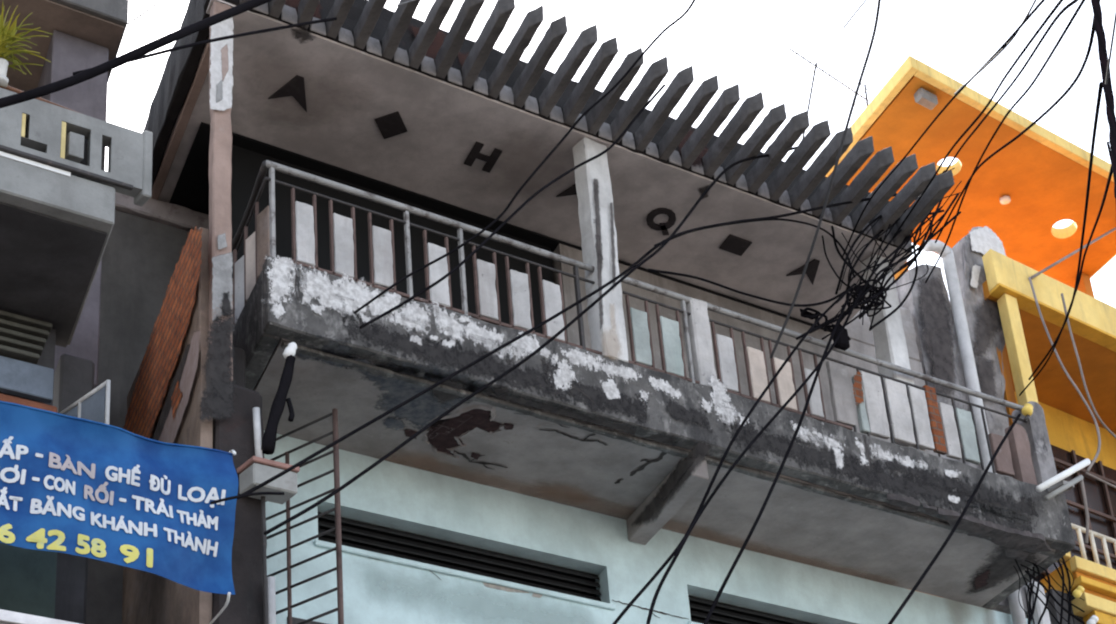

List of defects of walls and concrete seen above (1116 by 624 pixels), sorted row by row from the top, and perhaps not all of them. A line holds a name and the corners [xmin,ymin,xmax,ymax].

flaking render [404,405,514,460]
peeling [264,256,682,401]
leakage [289,314,678,445]
crack [514,359,607,446]
crack [615,452,667,484]
leakage [633,398,713,525]
peeling [791,421,928,470]
leakage [723,421,1039,533]
leakage [974,299,1001,401]
leakage [967,546,1040,593]